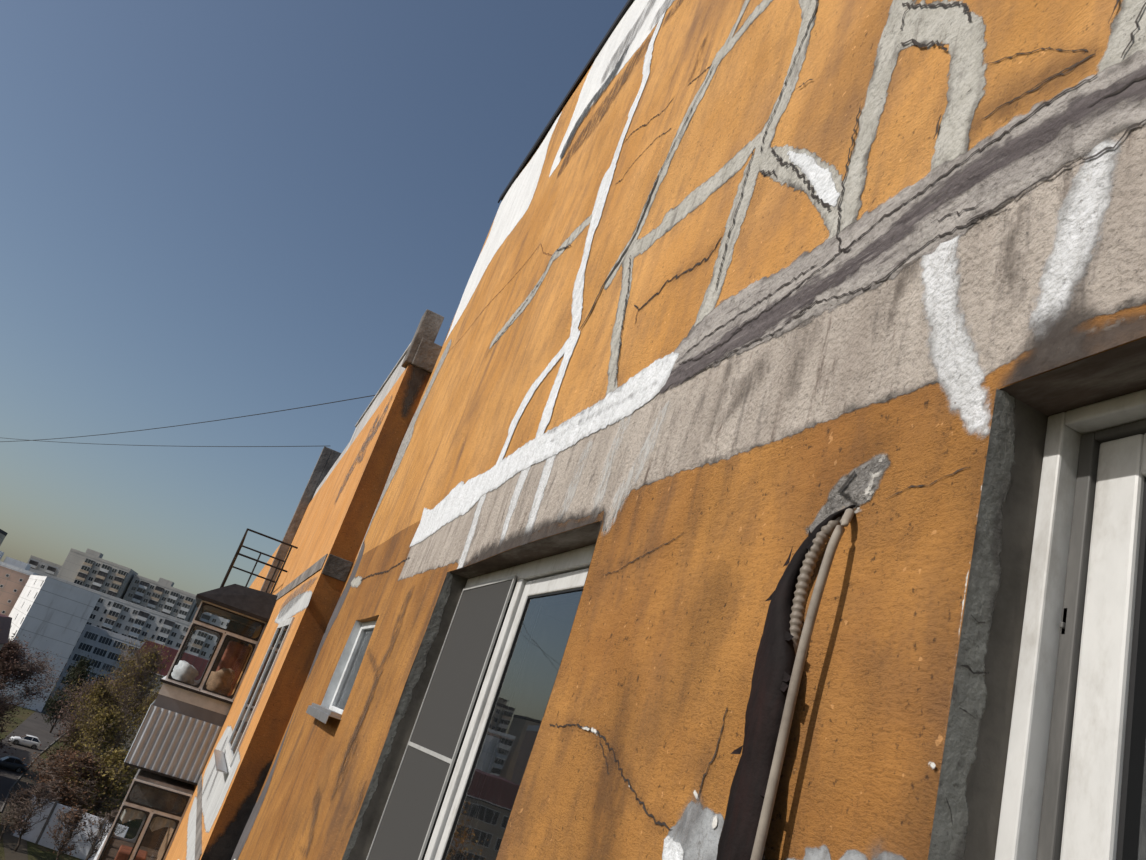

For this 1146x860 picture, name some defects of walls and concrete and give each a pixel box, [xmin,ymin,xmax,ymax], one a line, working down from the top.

crack [452,0,1146,465]
flaking render [806,454,890,533]
crack [890,467,970,497]
crack [603,533,683,575]
crack [549,723,672,831]
crack [696,709,727,800]